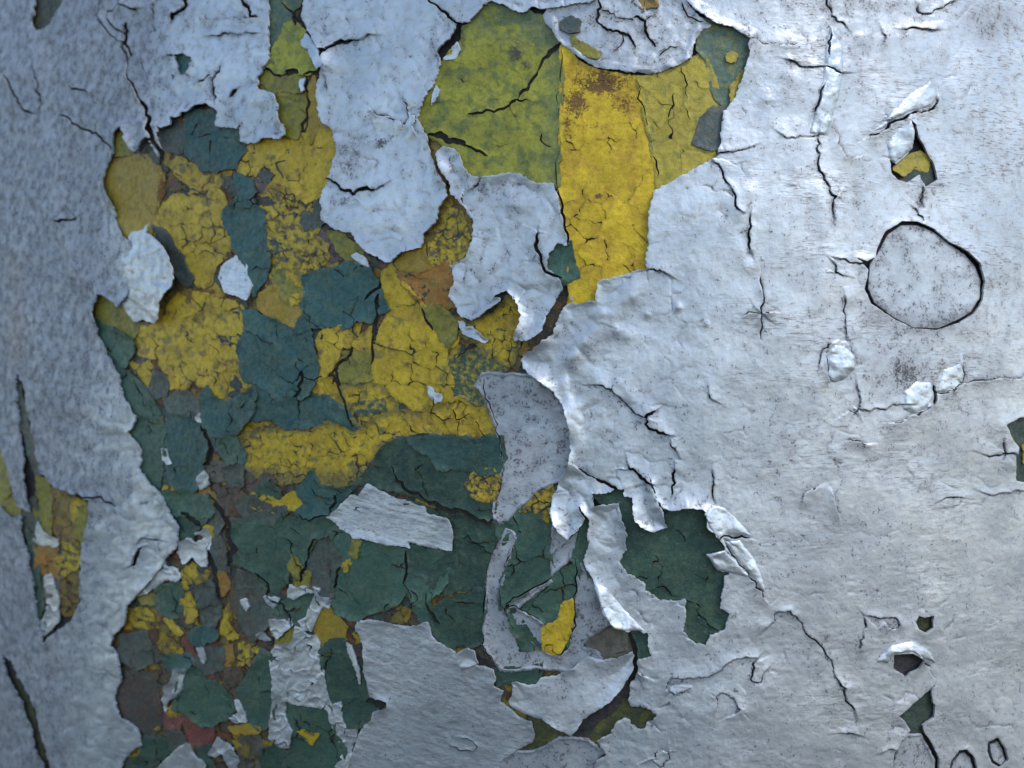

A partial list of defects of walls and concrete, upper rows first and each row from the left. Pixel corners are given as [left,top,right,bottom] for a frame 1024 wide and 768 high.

crack [3,71,111,146]
crack [788,0,845,214]
crack [715,150,752,250]
peeling [892,150,936,193]
crack [746,280,769,339]
peeling [93,0,750,768]
peeling [1007,417,1024,482]
peeling [0,382,89,639]
peeling [916,616,933,632]
crack [789,611,854,734]
peeling [893,654,923,676]
peeling [893,690,935,768]